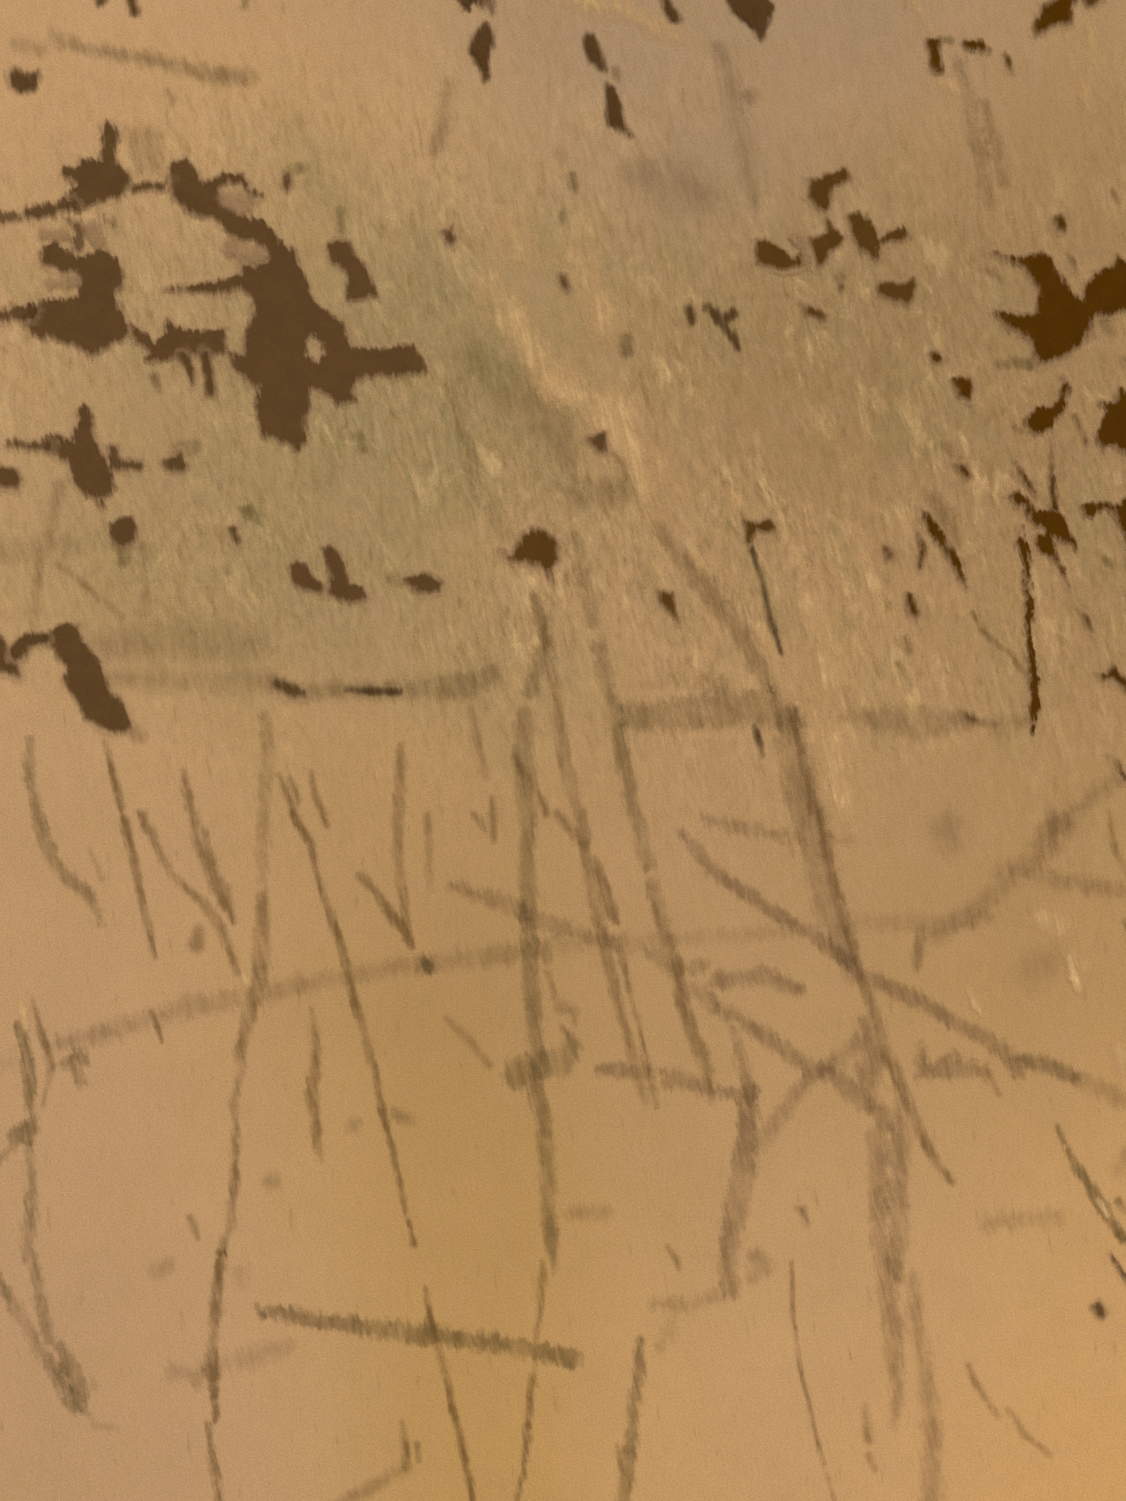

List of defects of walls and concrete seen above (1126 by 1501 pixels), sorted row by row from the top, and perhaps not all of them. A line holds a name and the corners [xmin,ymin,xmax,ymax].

peeling [460,0,494,80]
peeling [728,0,774,39]
peeling [926,36,945,74]
peeling [1032,0,1101,35]
peeling [754,166,912,271]
peeling [0,119,428,453]
peeling [993,249,1126,437]
peeling [1095,385,1126,454]
peeling [289,543,367,604]
peeling [500,525,561,585]
peeling [1009,450,1126,588]
peeling [0,621,131,734]